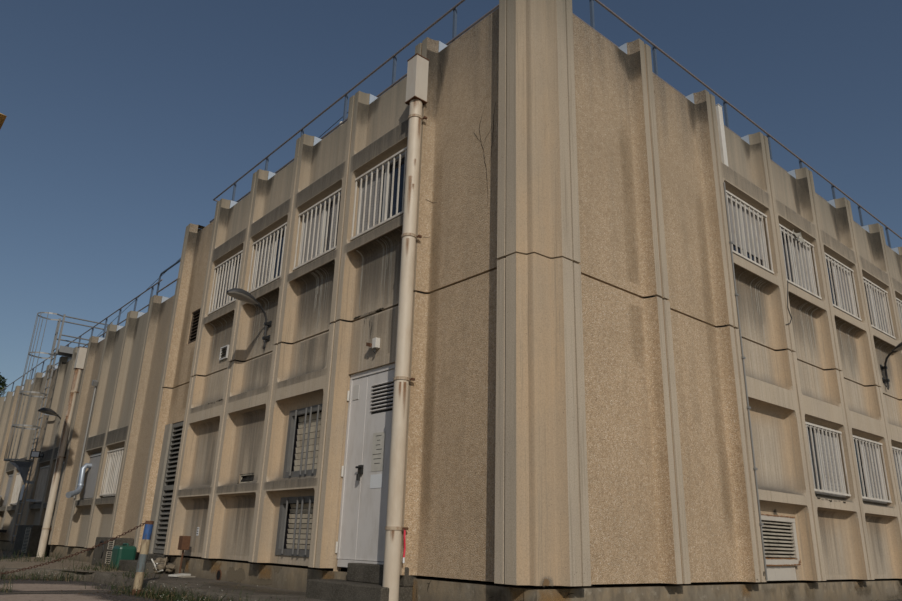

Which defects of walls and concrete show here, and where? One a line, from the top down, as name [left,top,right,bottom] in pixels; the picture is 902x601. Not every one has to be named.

crack [474,104,496,204]
water stain [792,176,809,206]